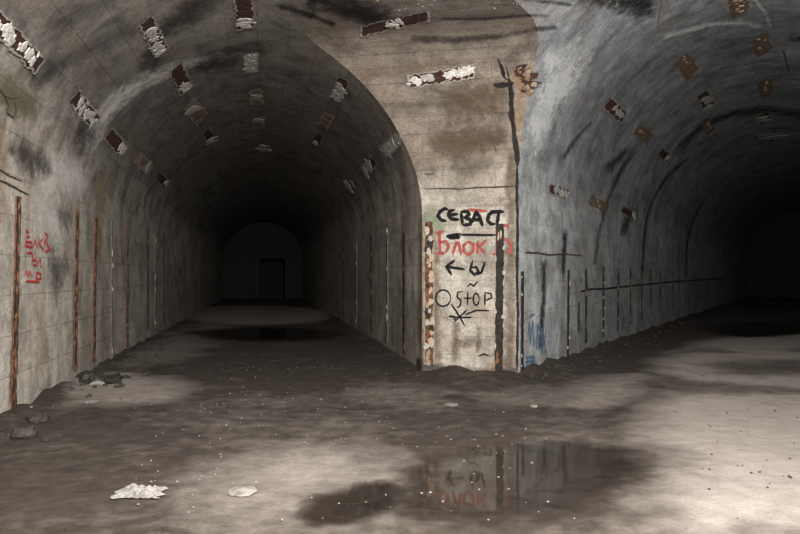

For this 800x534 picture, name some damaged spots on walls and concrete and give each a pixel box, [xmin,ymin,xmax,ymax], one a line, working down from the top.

spalling [0,10,45,75]
spalling [138,16,169,58]
spalling [233,0,257,31]
spalling [360,10,431,37]
spalling [728,0,749,17]
spalling [406,64,476,89]
spalling [69,89,101,129]